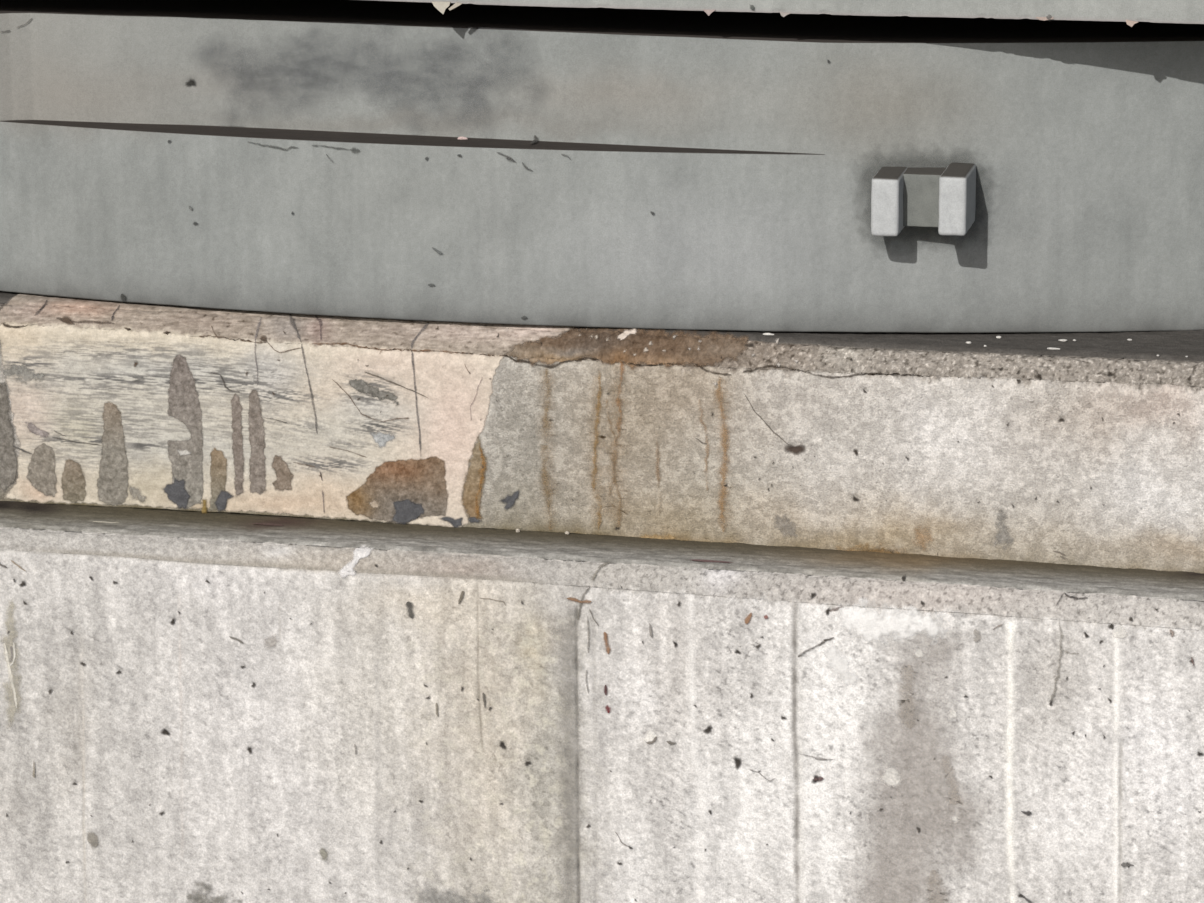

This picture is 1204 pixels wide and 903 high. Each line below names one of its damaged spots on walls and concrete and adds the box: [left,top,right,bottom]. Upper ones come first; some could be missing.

corrosion [508,327,748,374]
peeling [0,293,664,527]
water stain [840,599,944,641]